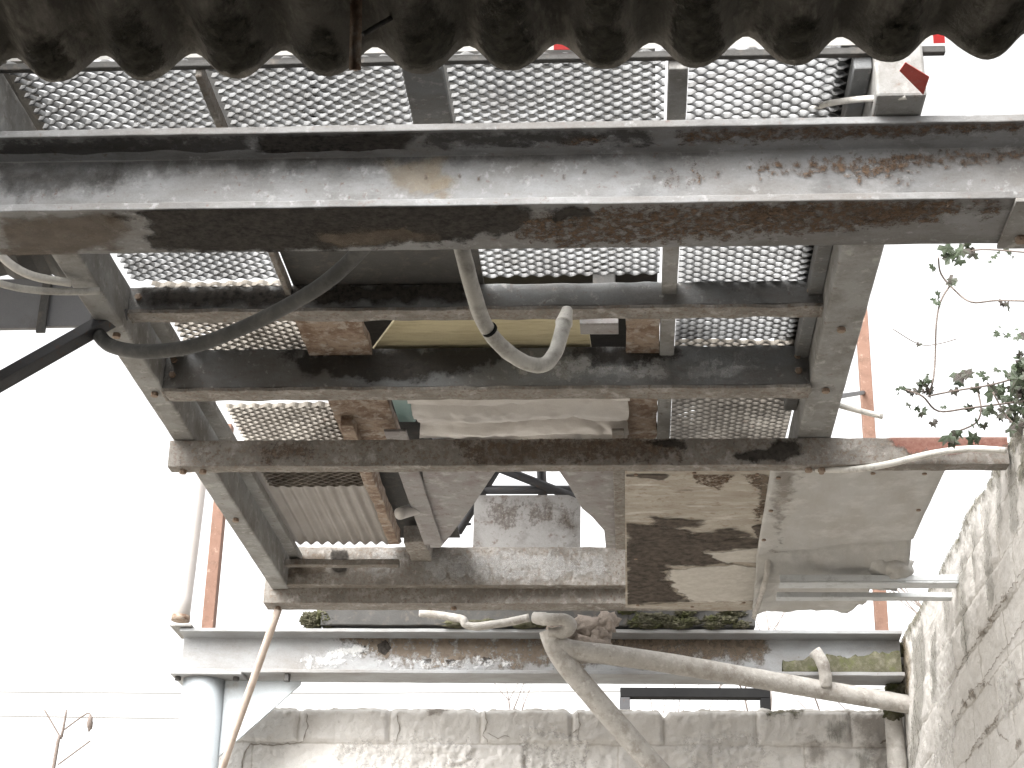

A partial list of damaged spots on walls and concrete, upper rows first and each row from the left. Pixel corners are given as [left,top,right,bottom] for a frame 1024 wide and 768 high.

corrosion [746,148,1024,185]
corrosion [1,214,128,255]
corrosion [510,200,1001,248]
corrosion [454,438,685,464]
spalling [669,548,758,602]